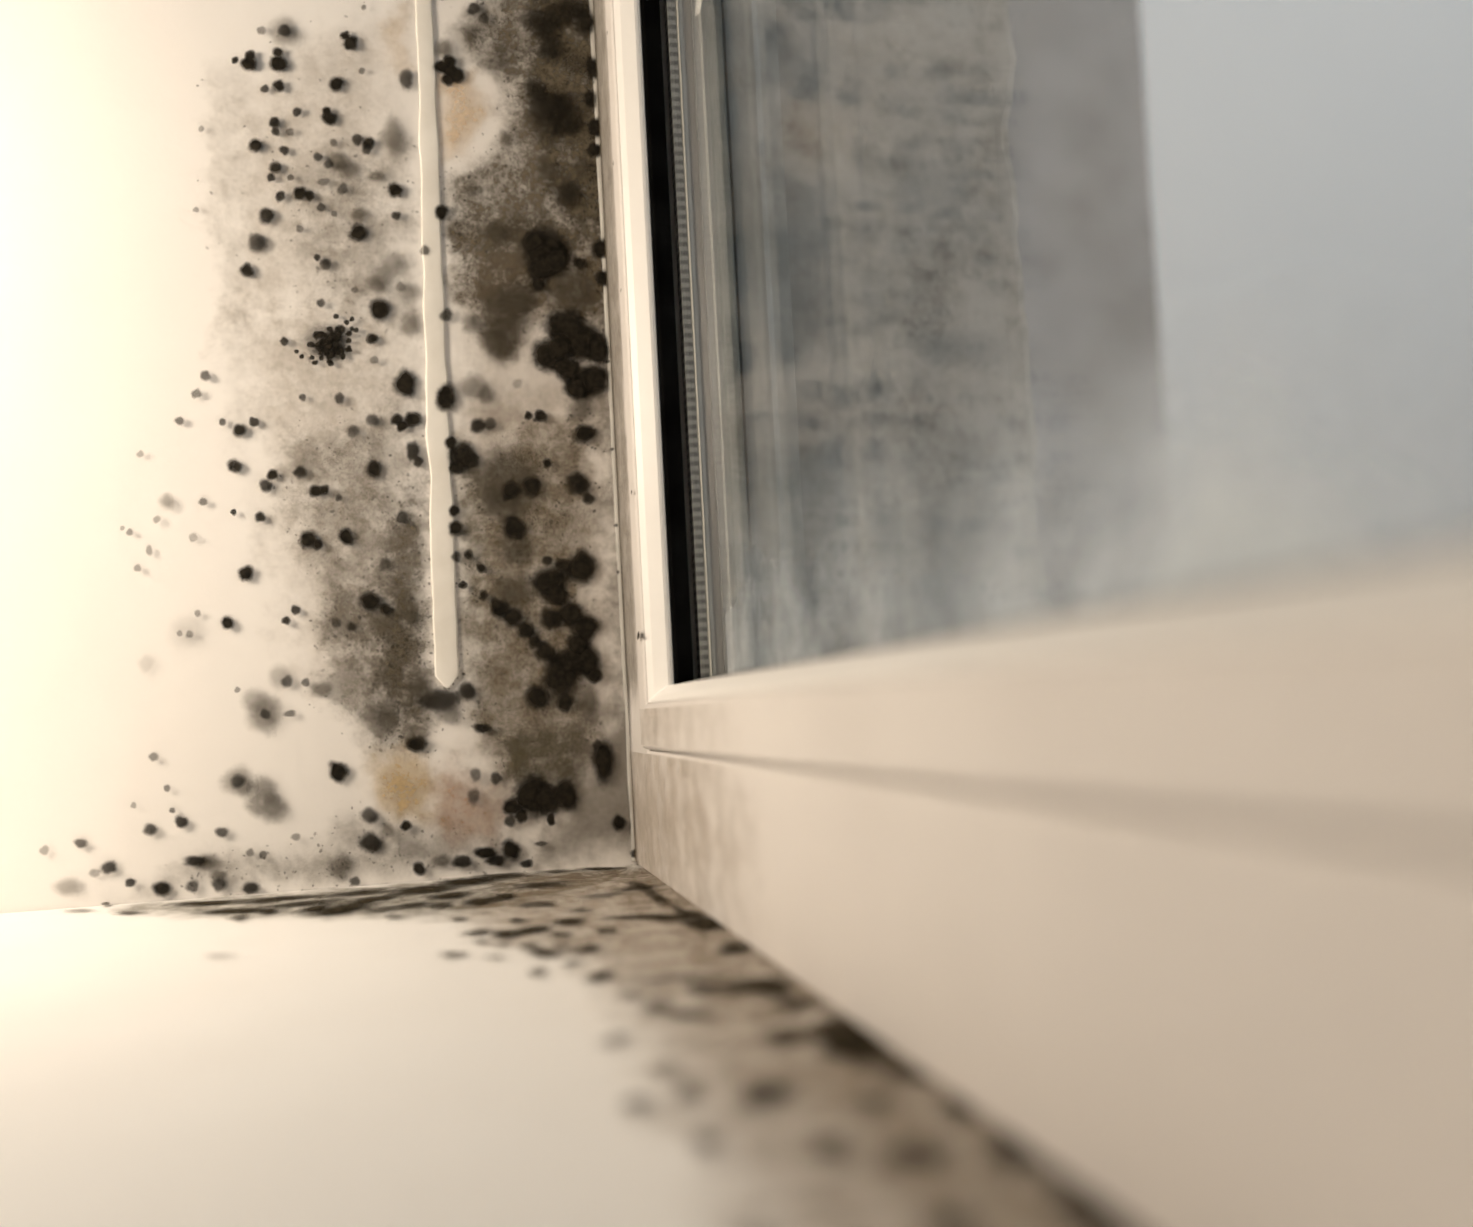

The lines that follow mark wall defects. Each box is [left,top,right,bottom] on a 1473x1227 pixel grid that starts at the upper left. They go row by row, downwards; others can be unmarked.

leakage [101,0,1134,1227]